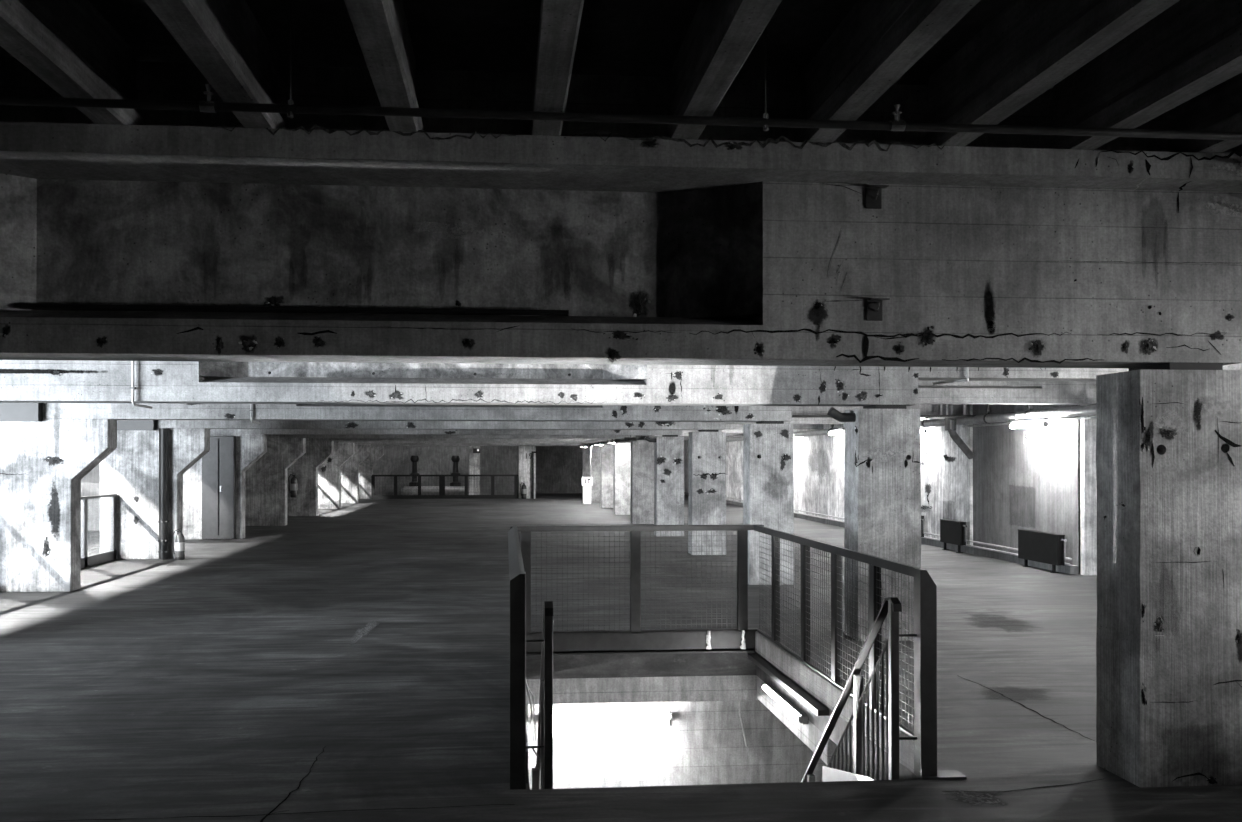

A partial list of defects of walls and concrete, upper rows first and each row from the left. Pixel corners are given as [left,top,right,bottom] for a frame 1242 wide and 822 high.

spalling [703,393,754,420]
spalling [1139,397,1177,451]
spalling [1214,430,1241,466]